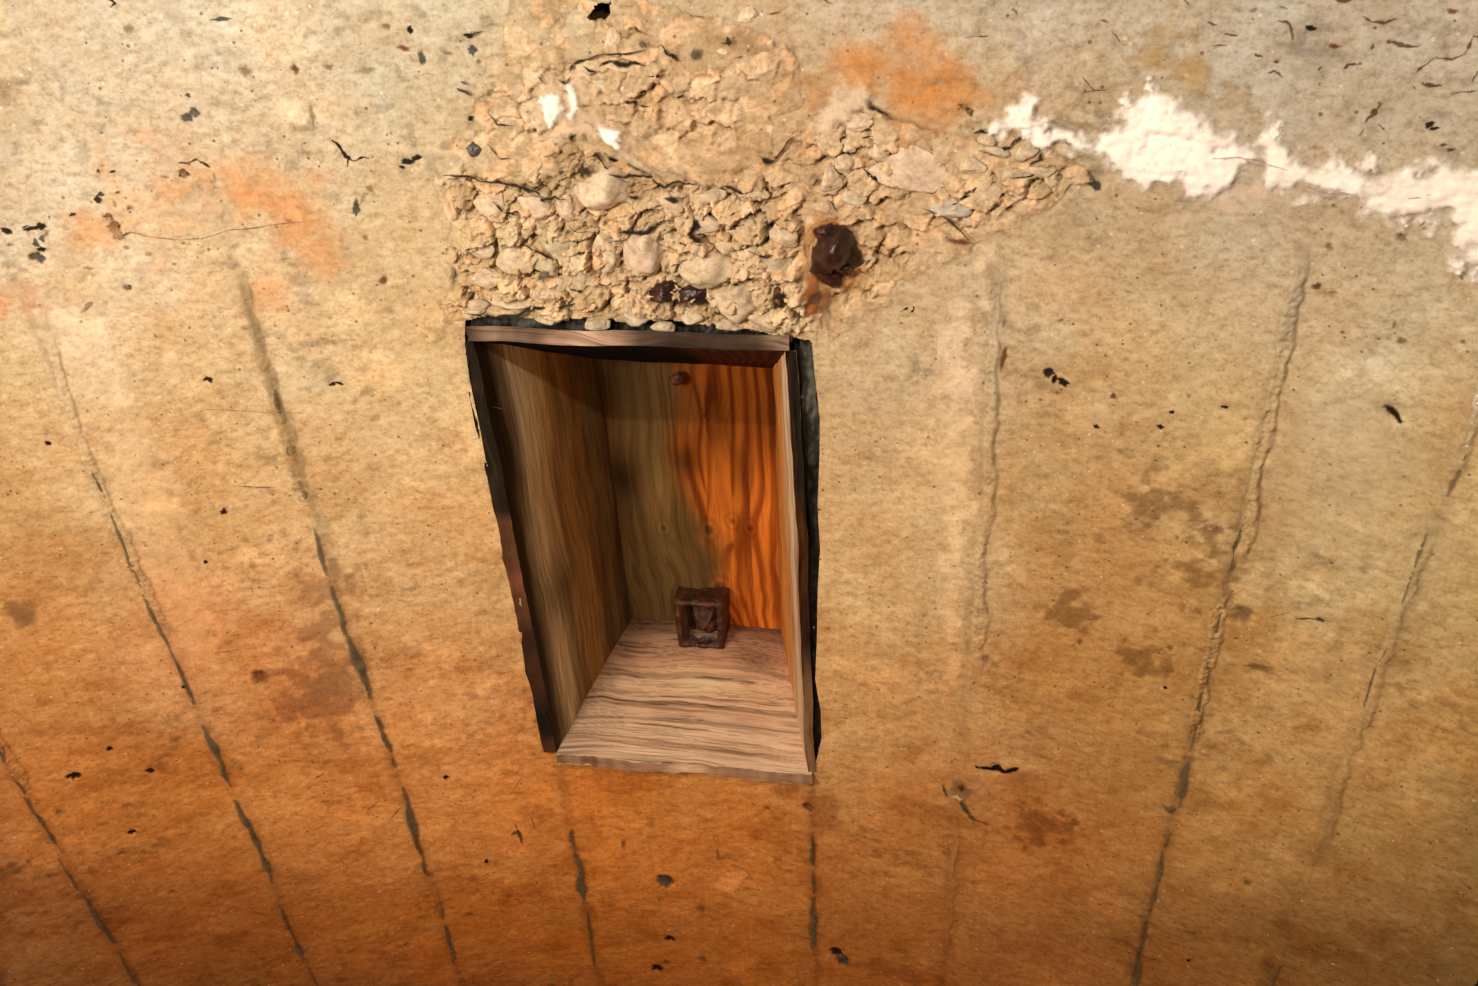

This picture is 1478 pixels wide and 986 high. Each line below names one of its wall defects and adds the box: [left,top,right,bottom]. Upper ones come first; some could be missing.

spalling [398,25,425,64]
damp [989,77,1478,284]
spalling [433,0,1090,697]
crack [1228,517,1246,575]
crack [1401,533,1426,603]
crack [1446,456,1466,496]
crack [0,744,140,986]
crack [92,473,317,986]
crack [207,391,455,967]
crack [511,779,533,844]
spalling [830,947,848,966]
crack [1132,615,1220,986]